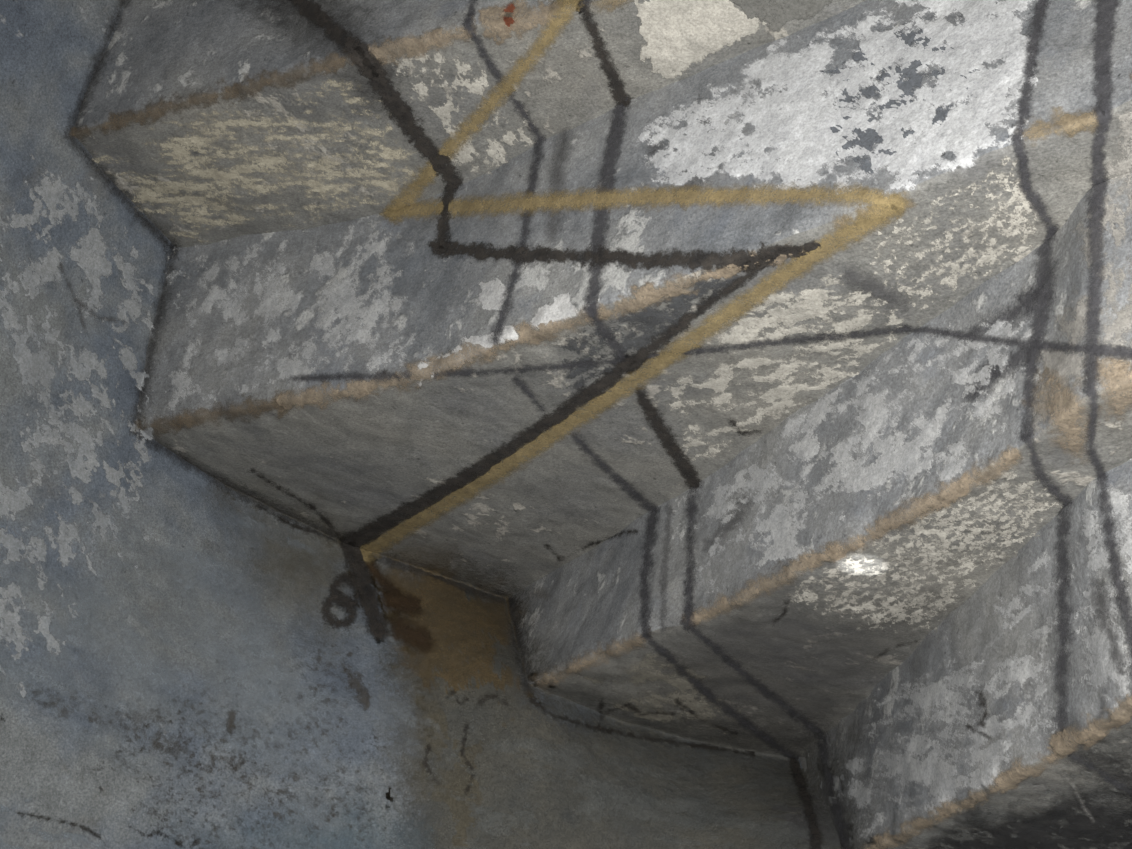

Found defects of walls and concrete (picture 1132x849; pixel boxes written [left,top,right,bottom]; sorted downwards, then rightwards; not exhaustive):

damp [381,555,530,704]
flaking render [368,0,1132,849]